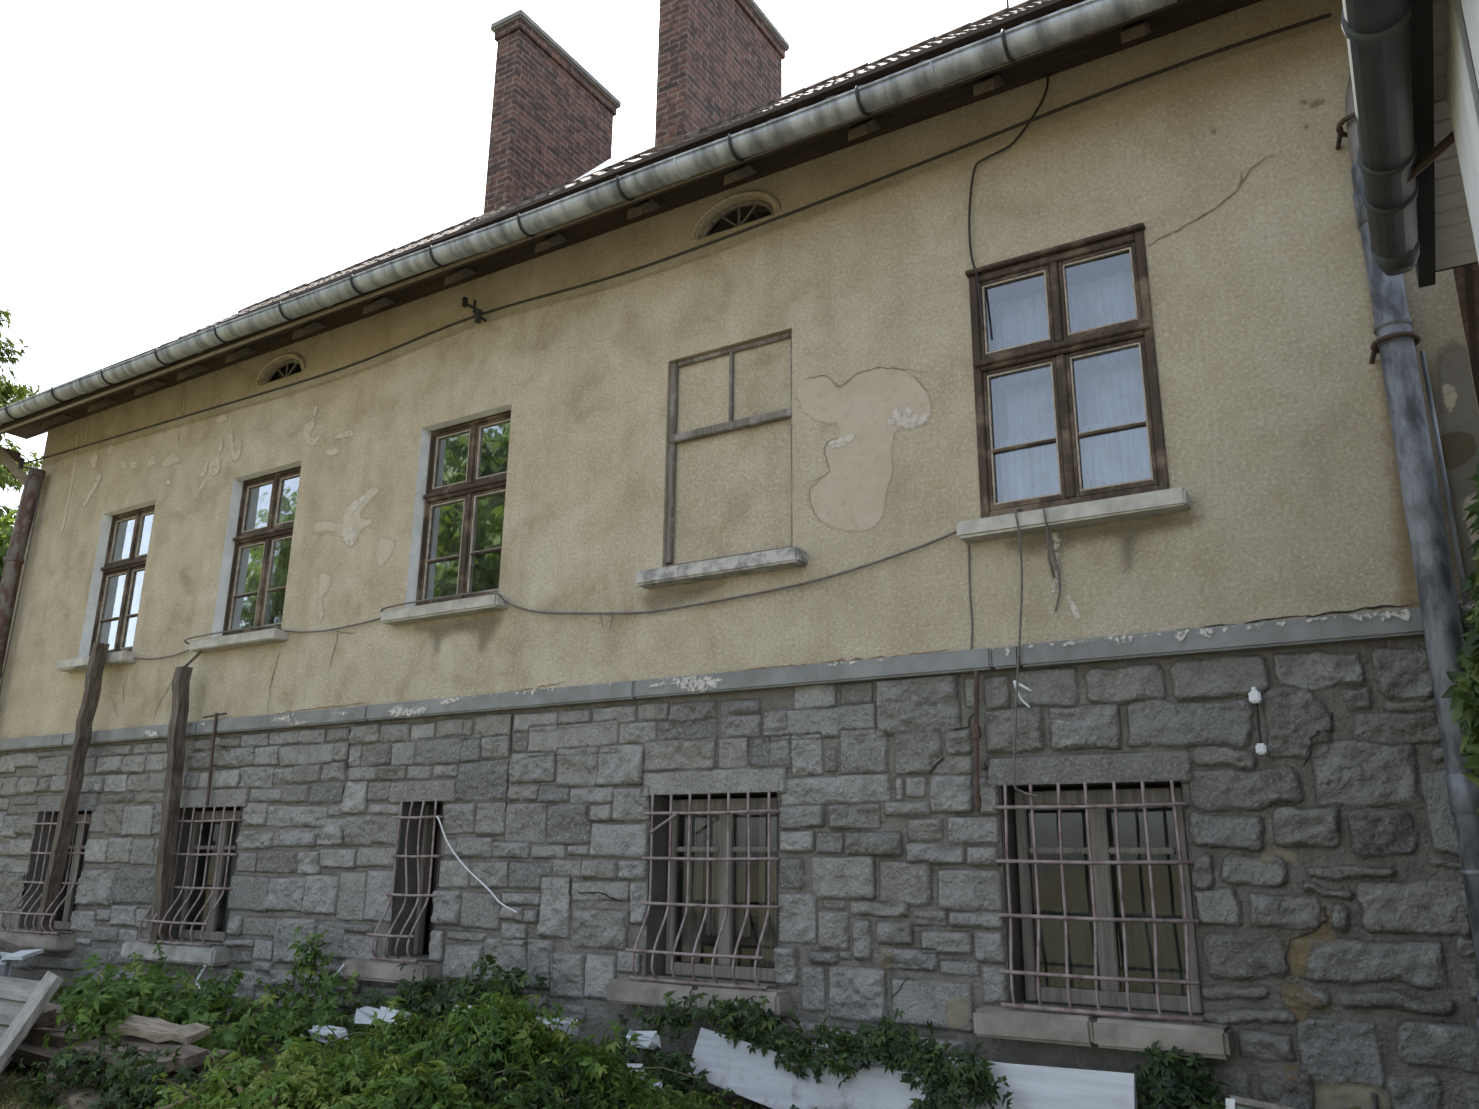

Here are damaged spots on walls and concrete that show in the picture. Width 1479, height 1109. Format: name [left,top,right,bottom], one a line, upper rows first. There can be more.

crack [1146,156,1274,246]
flaking render [796,367,931,532]
flaking render [313,486,395,566]
peeling [1051,532,1080,619]
peeling [999,621,1285,656]
peeling [1306,609,1411,623]